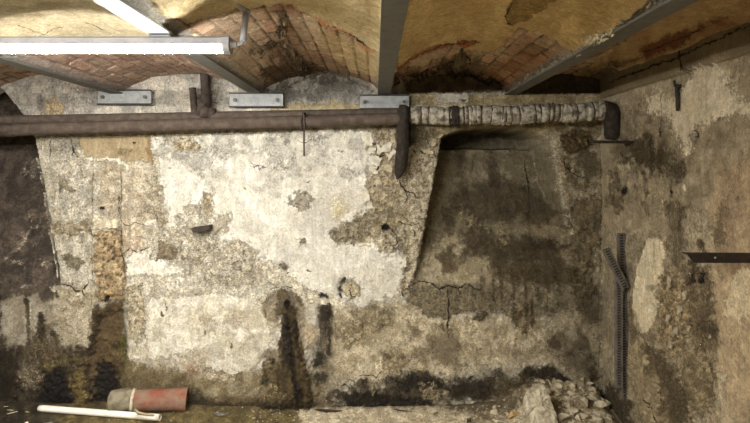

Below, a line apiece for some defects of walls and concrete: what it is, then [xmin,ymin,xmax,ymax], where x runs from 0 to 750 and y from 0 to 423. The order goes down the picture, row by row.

spalling [396,40,502,91]
flaking render [506,0,556,26]
spalling [516,0,663,85]
crack [608,23,750,83]
water stain [619,132,686,183]
peeling [36,125,495,382]
water stain [0,149,602,411]
crack [401,280,480,338]
water stain [664,200,702,285]
water stain [696,312,722,350]
water stain [713,204,728,247]
water stain [642,343,694,423]